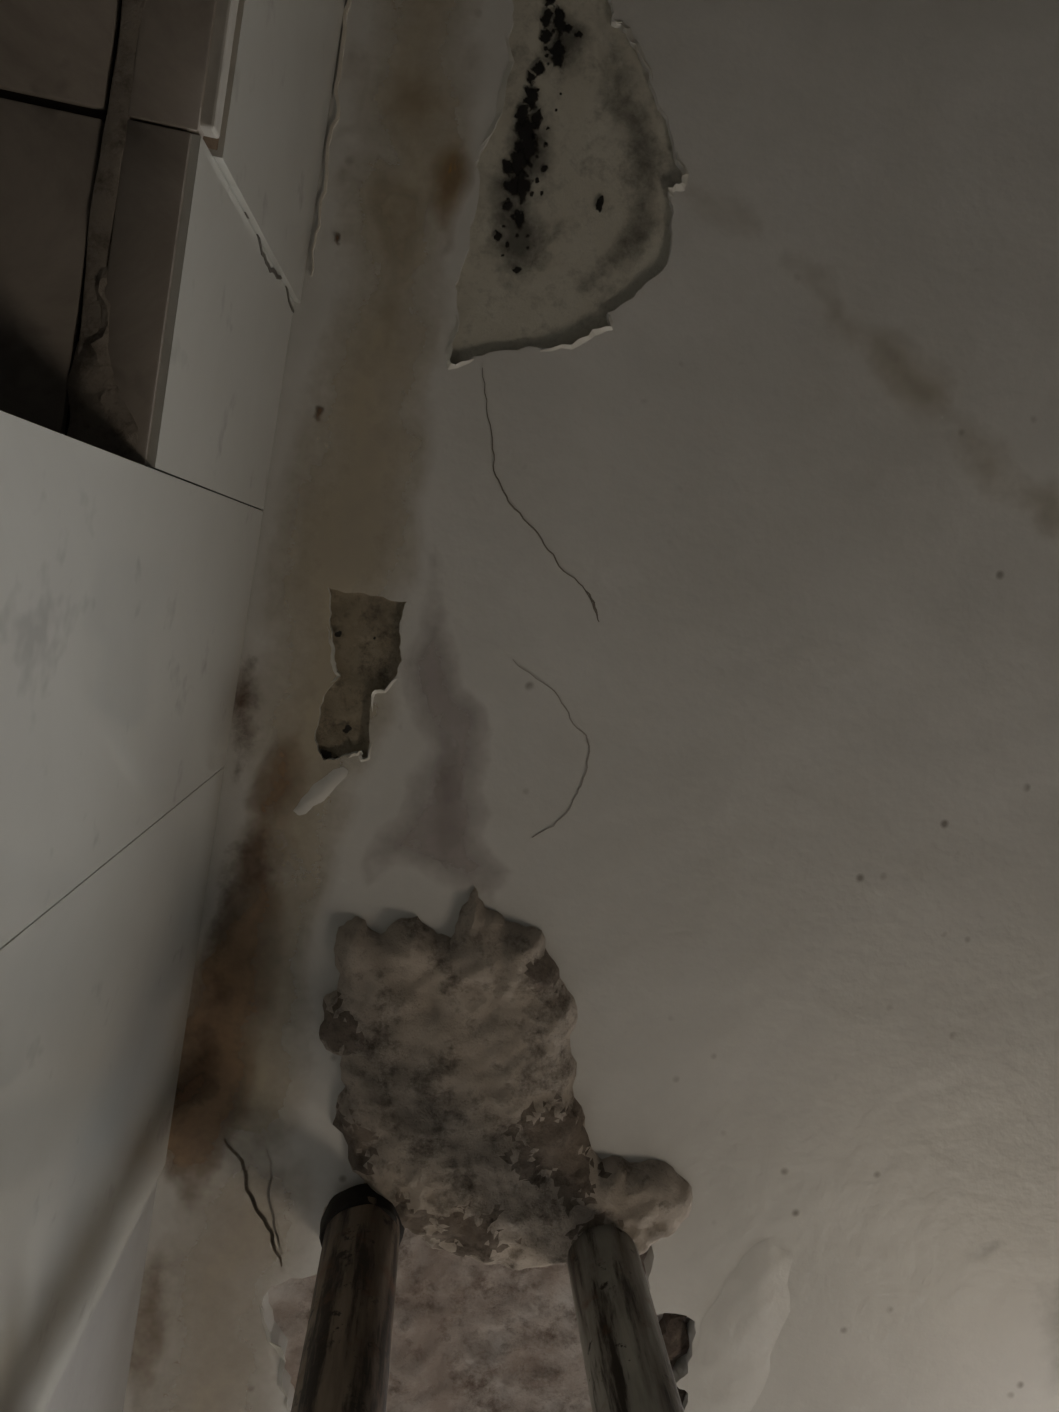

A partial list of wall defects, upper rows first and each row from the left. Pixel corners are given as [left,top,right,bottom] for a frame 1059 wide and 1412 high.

mould [494,0,583,273]
peeling [445,0,689,370]
leakage [275,0,463,859]
crack [482,368,599,622]
peeling [316,588,406,762]
leakage [231,882,311,1128]
leakage [179,1180,281,1412]
flaking render [259,1274,317,1410]
flaking render [386,1228,592,1412]
flaking render [657,1313,690,1371]